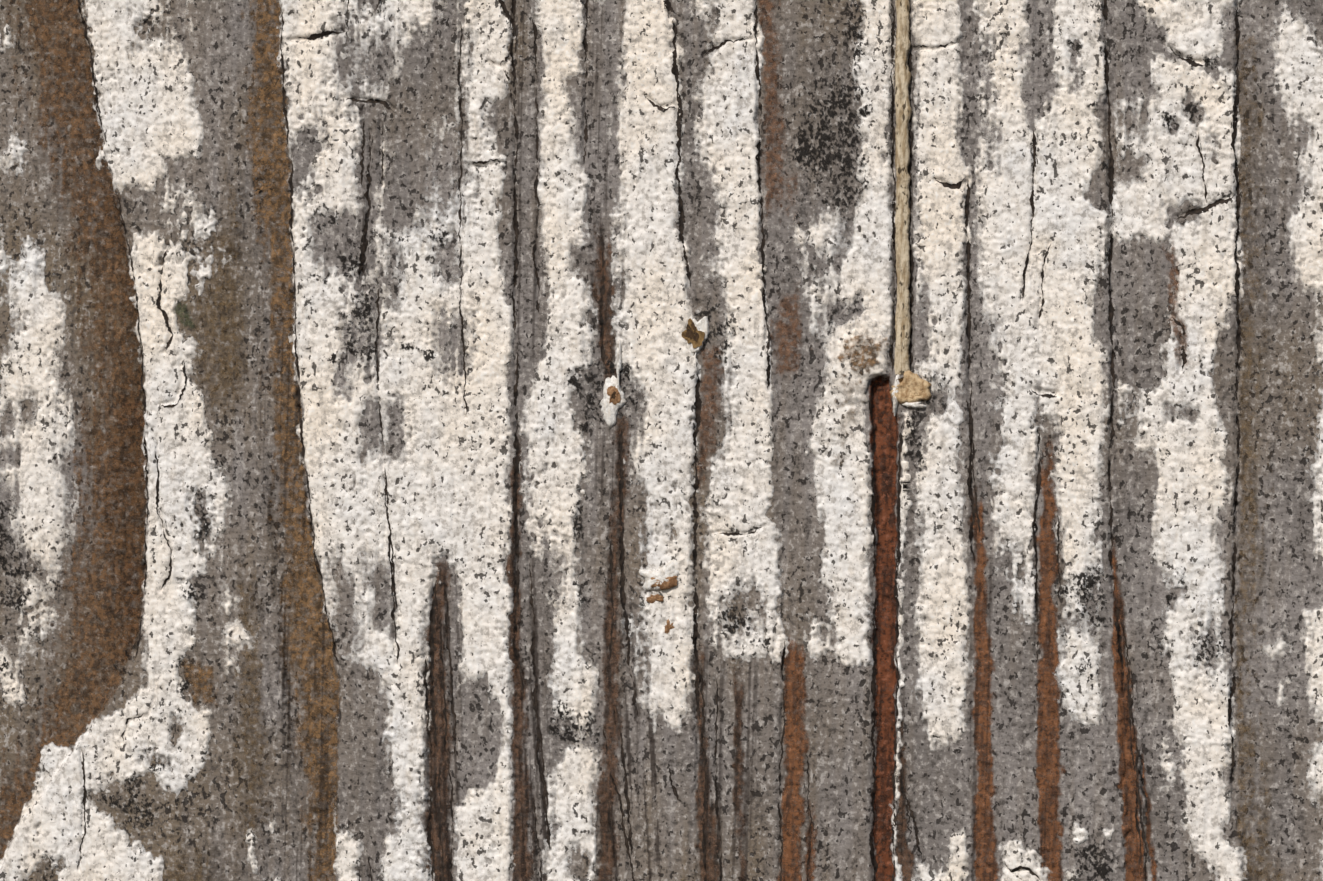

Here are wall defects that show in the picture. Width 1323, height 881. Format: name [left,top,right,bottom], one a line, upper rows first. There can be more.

water stain [0,0,147,860]
peeling [246,828,258,873]
crack [457,0,551,881]
peeling [277,0,877,881]
crack [647,0,771,389]
water stain [759,0,881,222]
corrosion [869,375,899,881]
water stain [896,720,914,881]
corrosion [970,501,998,881]
peeling [793,0,1247,881]
corrosion [1036,446,1065,881]
crack [1170,5,1241,783]